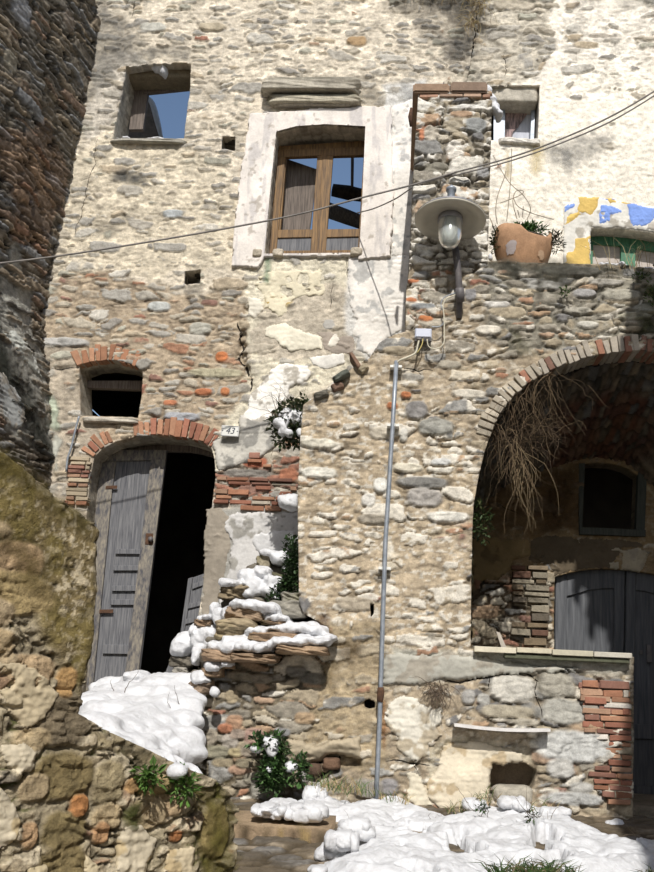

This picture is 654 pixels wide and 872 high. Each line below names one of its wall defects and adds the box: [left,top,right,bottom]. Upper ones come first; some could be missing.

peeling [563,197,654,264]
crack [236,322,253,391]
peeling [201,99,413,615]